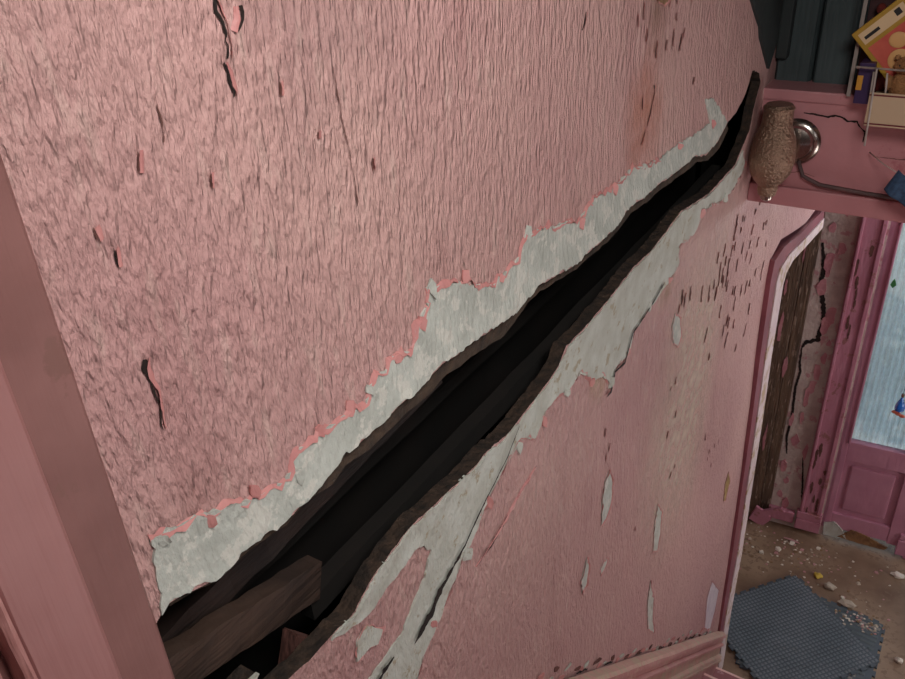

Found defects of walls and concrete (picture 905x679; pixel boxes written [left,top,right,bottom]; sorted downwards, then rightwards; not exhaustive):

peeling [637,2,685,58]
peeling [113,246,123,268]
peeling [671,204,767,351]
crack [148,67,761,679]
crack [785,243,826,500]
peeling [601,444,614,526]
peeling [537,580,719,679]